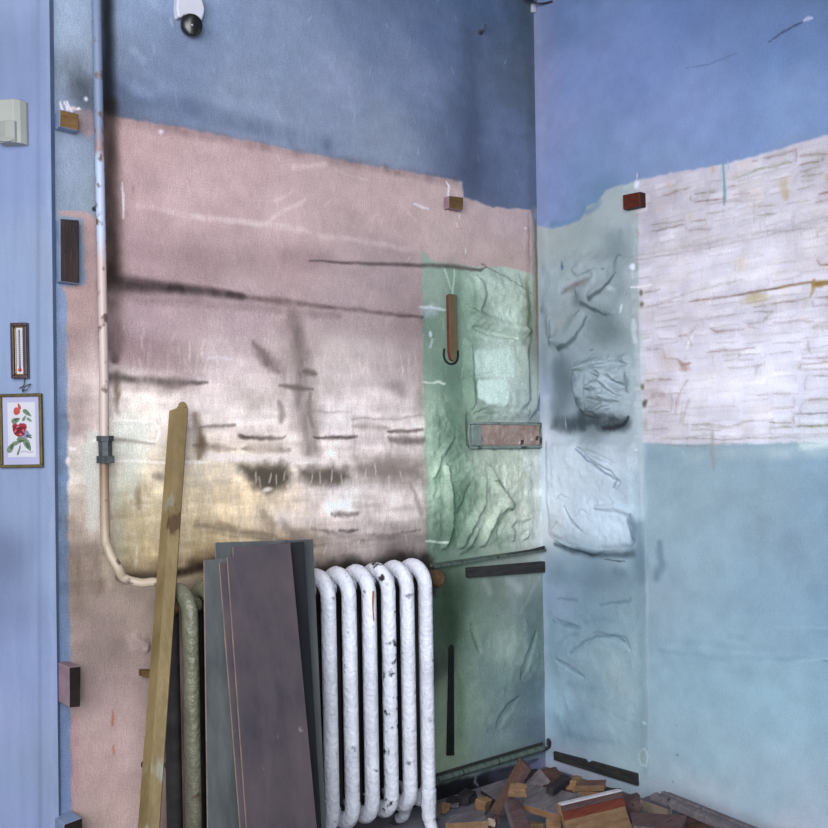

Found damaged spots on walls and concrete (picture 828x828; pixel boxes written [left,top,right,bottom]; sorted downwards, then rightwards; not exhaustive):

crack [767,14,828,43]
water stain [107,288,176,323]
water stain [529,142,828,451]
water stain [205,291,446,549]
water stain [108,362,170,562]
water stain [444,491,485,557]
water stain [488,499,518,552]